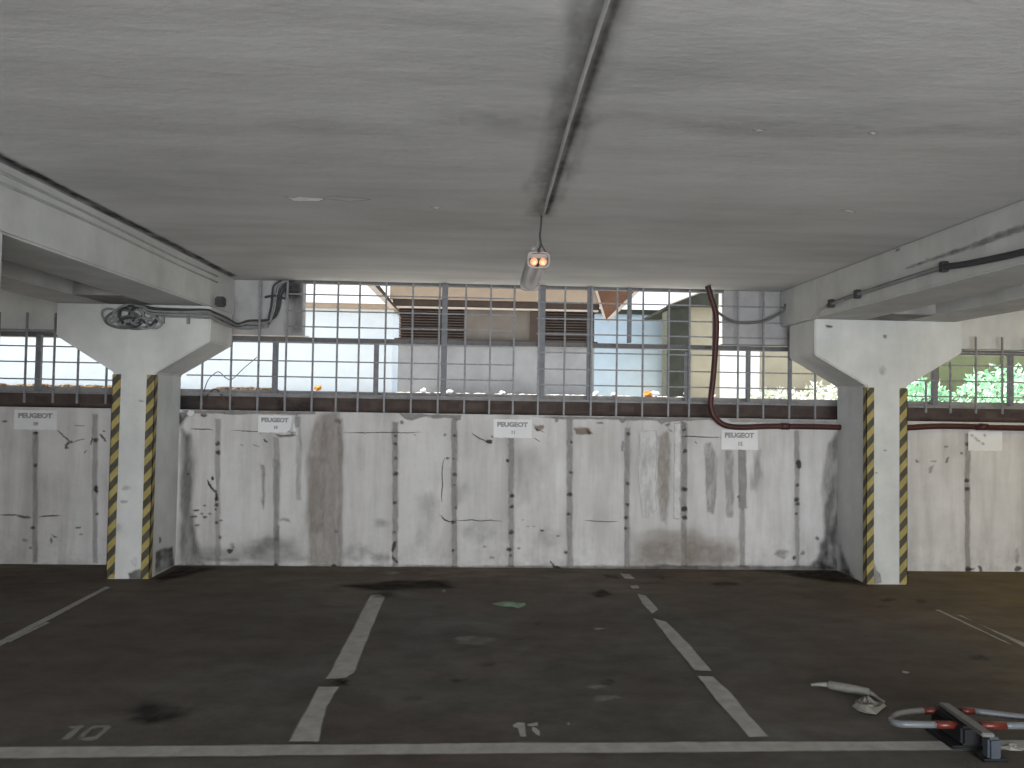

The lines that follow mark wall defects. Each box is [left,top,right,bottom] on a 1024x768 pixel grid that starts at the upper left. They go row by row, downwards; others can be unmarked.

crack [57,425,106,454]
leakage [308,423,342,563]
leakage [658,432,670,510]
leakage [706,450,759,517]
leakage [814,477,838,569]